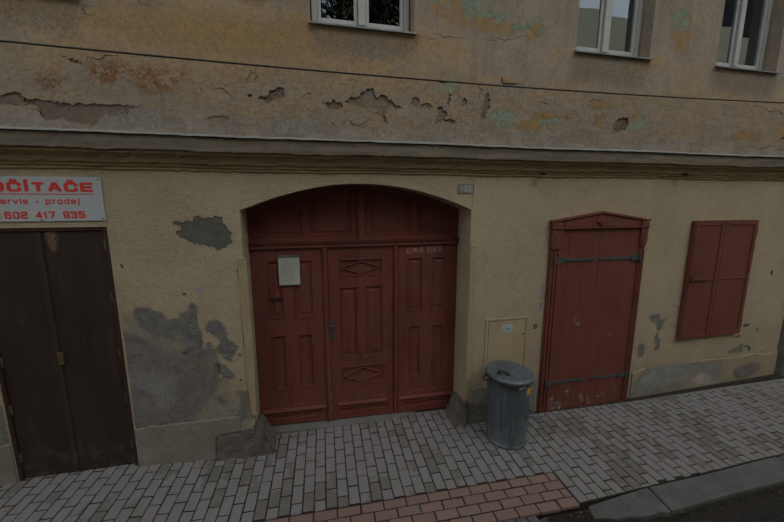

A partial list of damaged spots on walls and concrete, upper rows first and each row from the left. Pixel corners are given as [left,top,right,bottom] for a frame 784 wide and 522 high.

flaking render [0,91,137,126]
flaking render [248,87,285,103]
flaking render [323,87,402,123]
flaking render [411,82,456,124]
flaking render [173,215,234,251]
peeling [637,314,666,358]